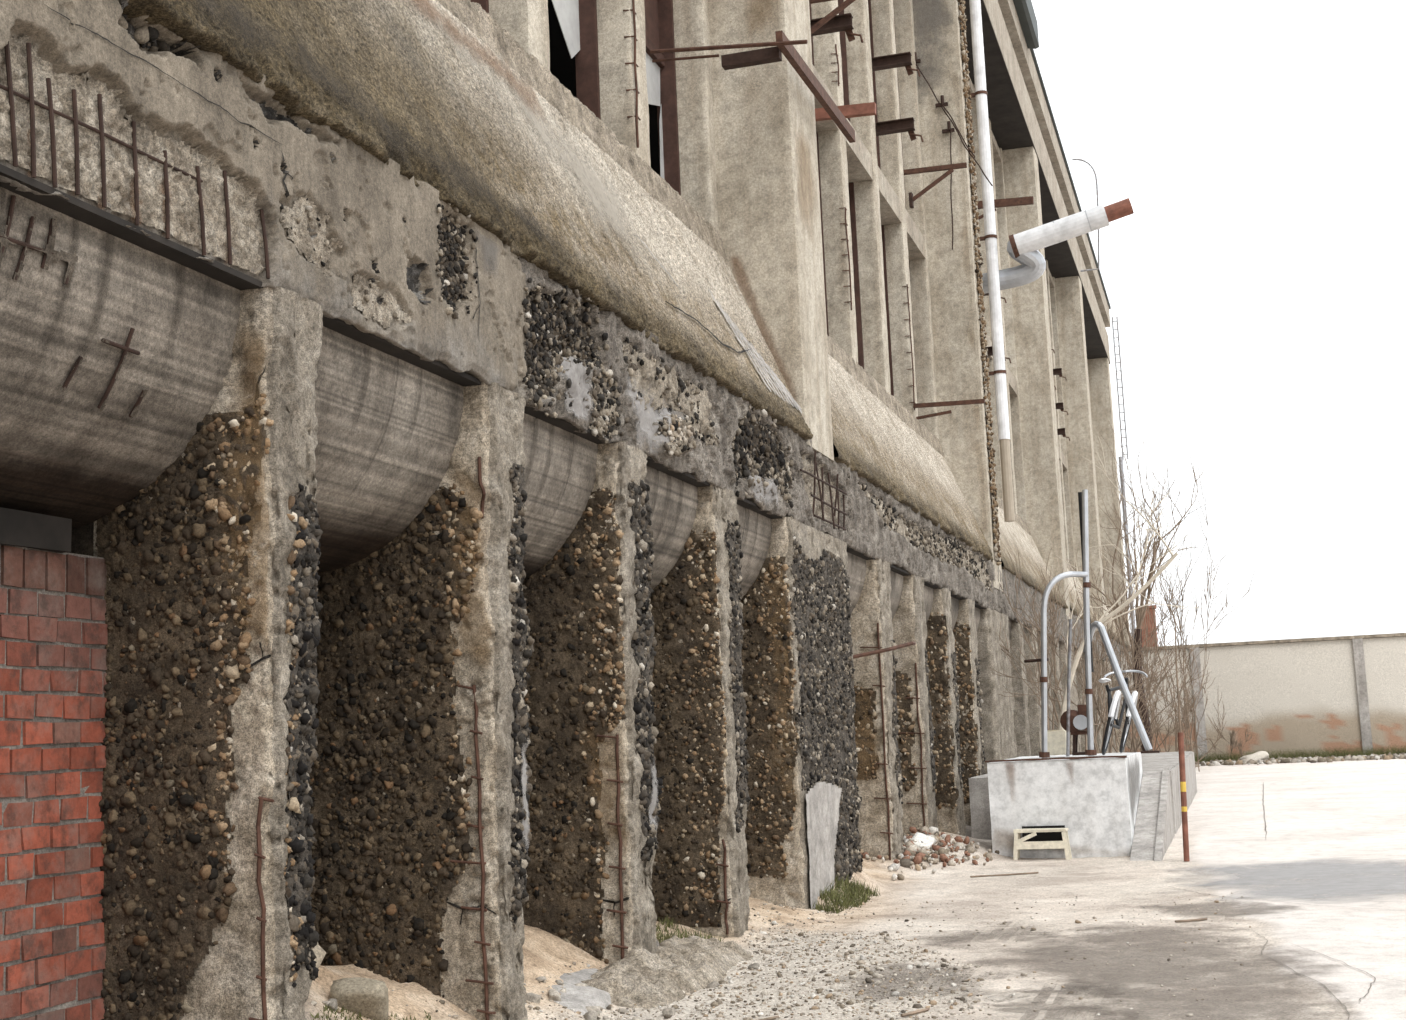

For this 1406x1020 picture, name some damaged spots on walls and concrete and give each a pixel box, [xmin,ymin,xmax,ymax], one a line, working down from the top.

crack [35,0,293,198]
spalling [0,34,349,288]
spalling [96,389,274,1020]
spalling [249,457,496,1020]
spalling [507,0,1002,964]
crack [1257,933,1401,1019]